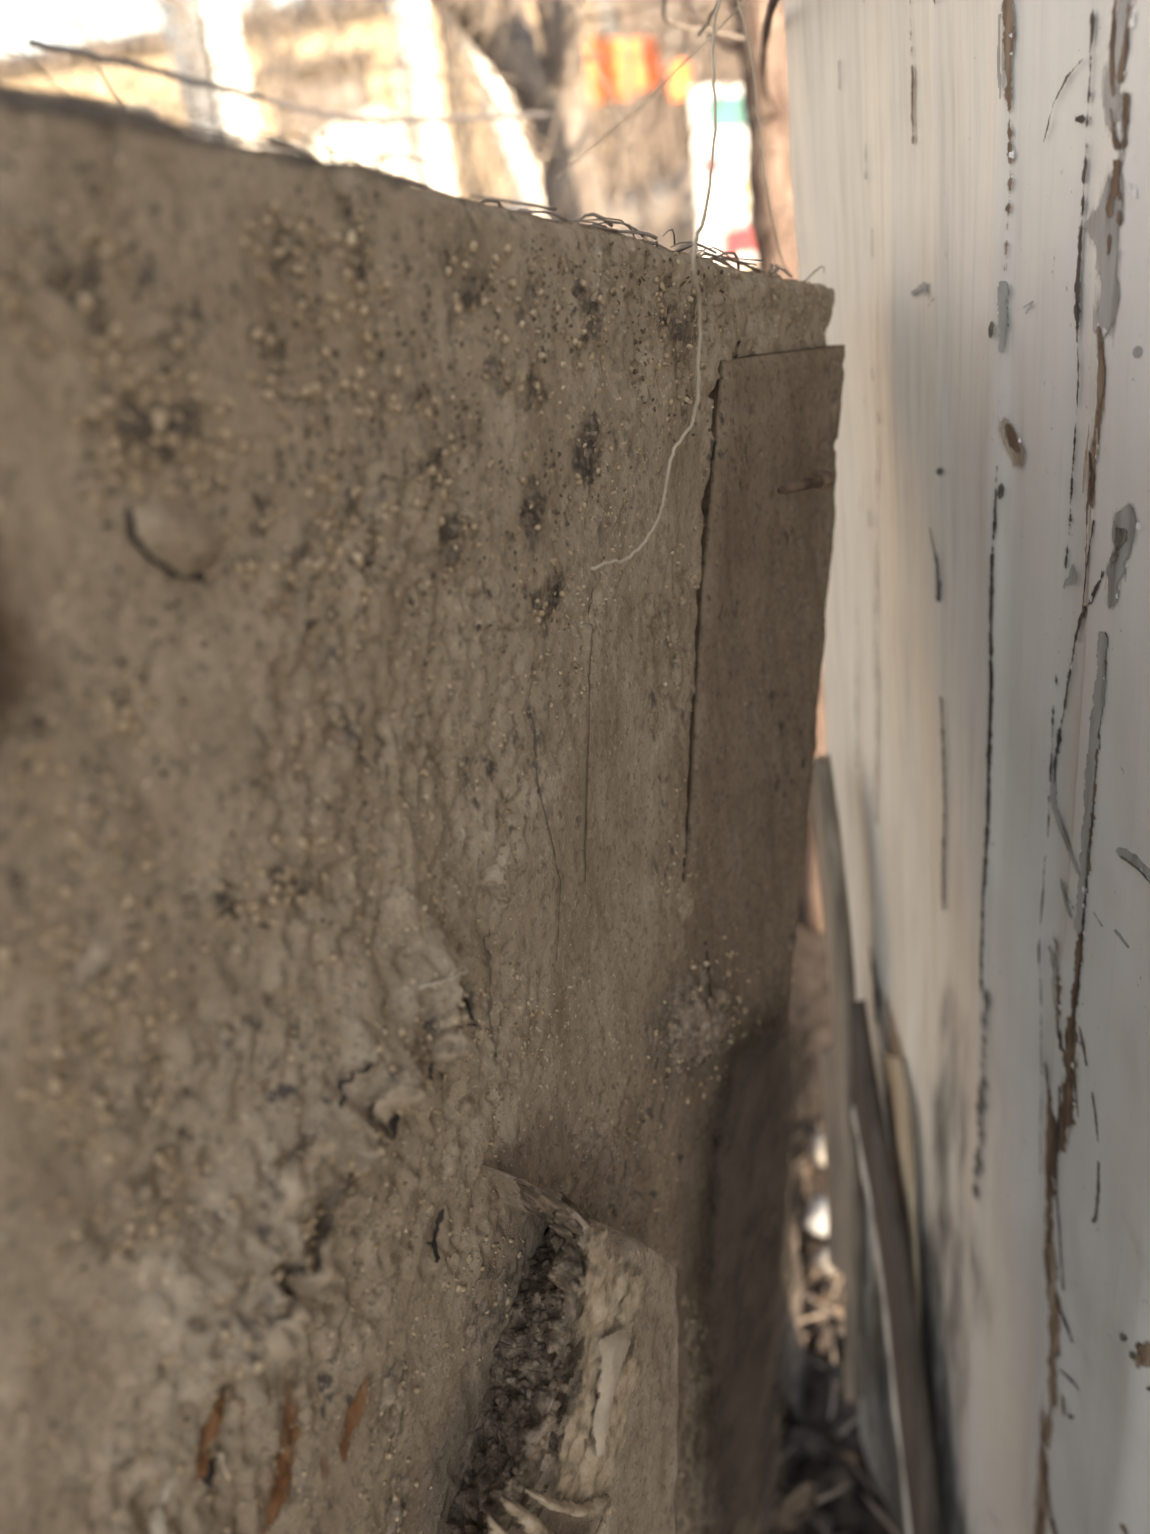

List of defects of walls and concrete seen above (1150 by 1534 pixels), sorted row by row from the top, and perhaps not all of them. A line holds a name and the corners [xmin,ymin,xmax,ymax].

peeling [1083,0,1137,339]
peeling [998,414,1024,466]
peeling [1106,504,1142,607]
peeling [1031,938,1087,1534]